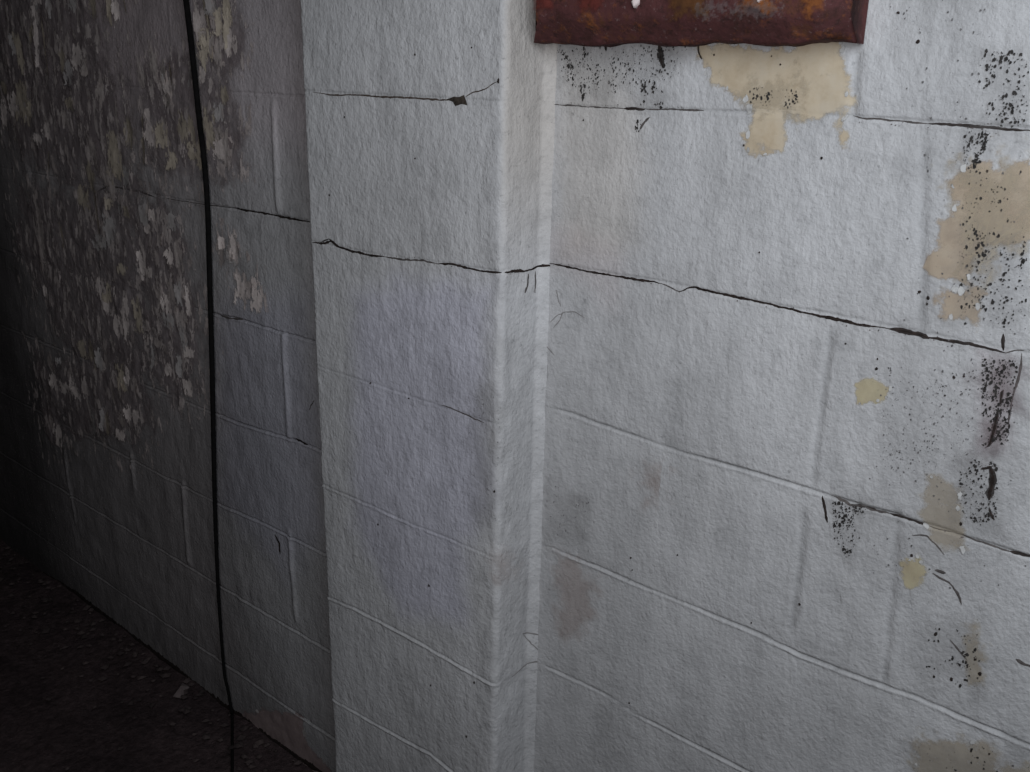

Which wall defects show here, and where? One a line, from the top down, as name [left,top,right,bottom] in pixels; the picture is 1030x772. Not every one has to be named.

corrosion [743,0,776,14]
crack [314,82,496,106]
crack [554,103,704,111]
mould [557,45,702,109]
peeling [697,42,856,157]
crack [855,116,1030,134]
peeling [918,161,1030,323]
crack [97,186,1024,426]
peeling [855,358,892,404]
mould [869,358,1020,526]
crack [822,495,1030,605]